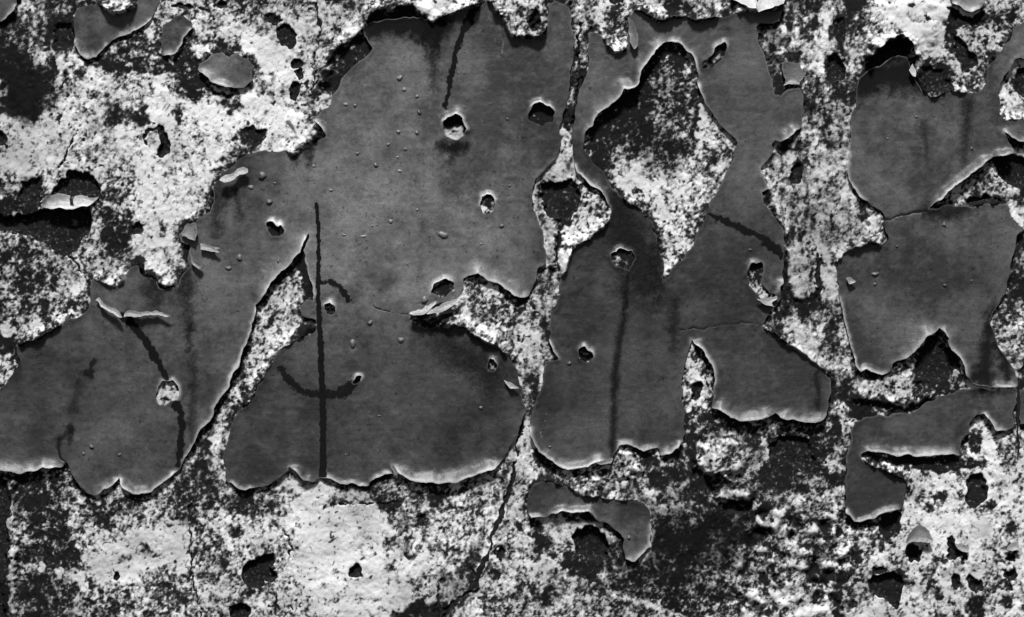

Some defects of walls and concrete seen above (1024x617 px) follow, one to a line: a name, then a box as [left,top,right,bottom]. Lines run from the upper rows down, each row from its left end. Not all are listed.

leakage [364,6,480,110]
peeling [577,0,888,428]
peeling [849,0,1024,99]
peeling [929,133,1024,235]
peeling [998,58,1024,121]
peeling [1001,128,1024,144]
peeling [0,0,614,617]
leakage [316,304,327,477]
peeling [478,233,1024,617]
crack [435,420,525,617]